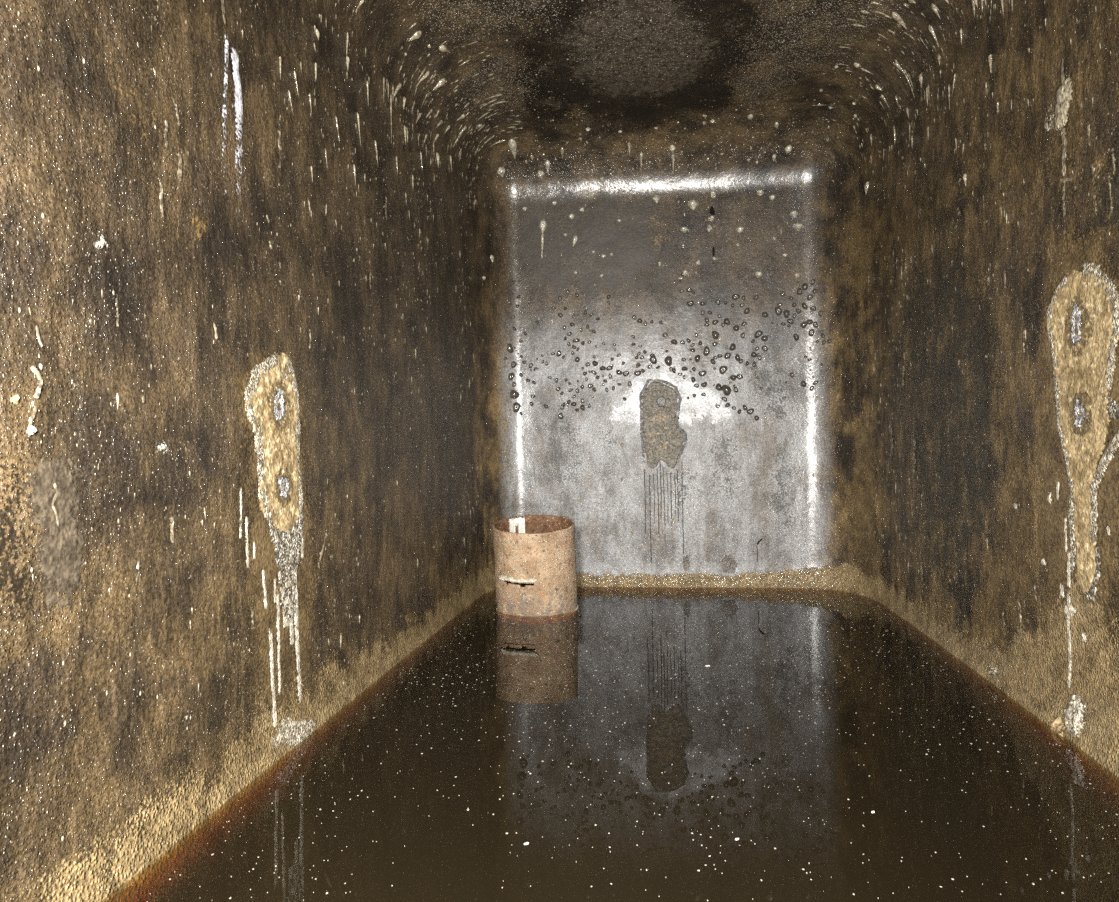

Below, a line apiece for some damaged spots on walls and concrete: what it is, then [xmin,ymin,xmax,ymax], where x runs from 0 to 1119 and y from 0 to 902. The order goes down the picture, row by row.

leakage [221,0,243,190]
leakage [397,0,894,138]
leakage [1044,61,1119,236]
leakage [704,190,813,291]
corrosion [639,379,687,563]
leakage [599,368,737,494]
leakage [670,468,694,507]
leakage [748,328,794,421]
leakage [766,447,795,527]
leakage [905,241,1004,590]
leakage [6,559,496,902]
leakage [576,554,1119,839]